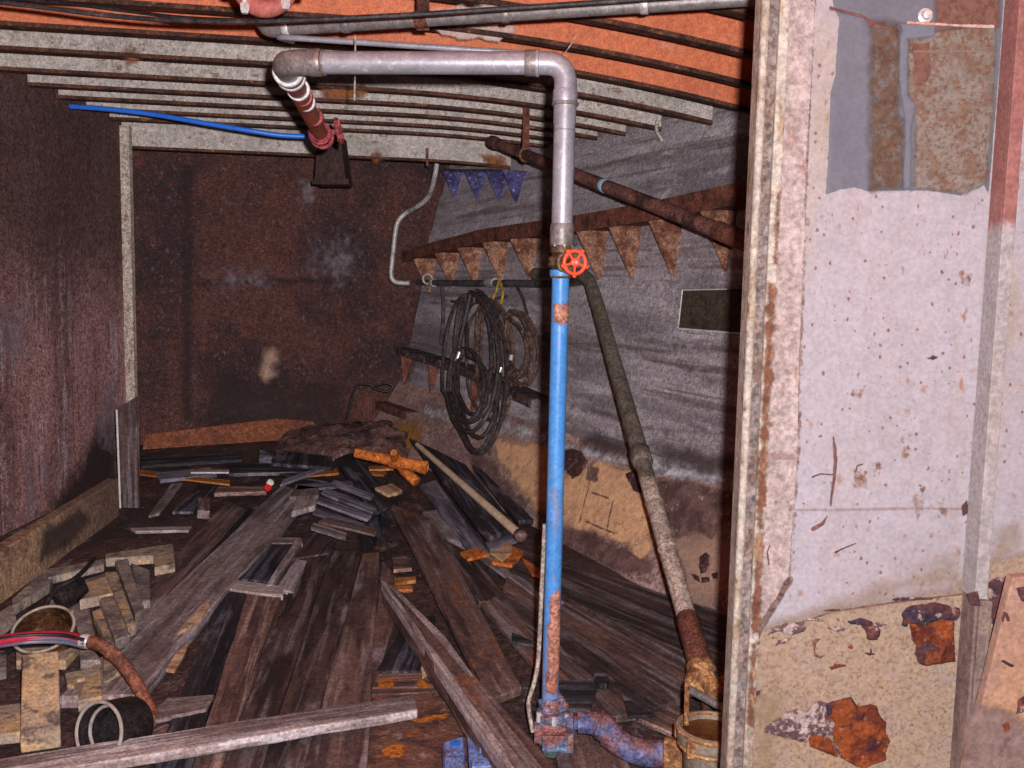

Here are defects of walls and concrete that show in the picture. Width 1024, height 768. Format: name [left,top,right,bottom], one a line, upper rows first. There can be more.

peeling [826,0,1003,195]
water stain [262,352,275,379]
corrosion [747,283,777,726]
spalling [769,609,888,670]
spalling [892,597,961,666]
spalling [764,697,890,768]